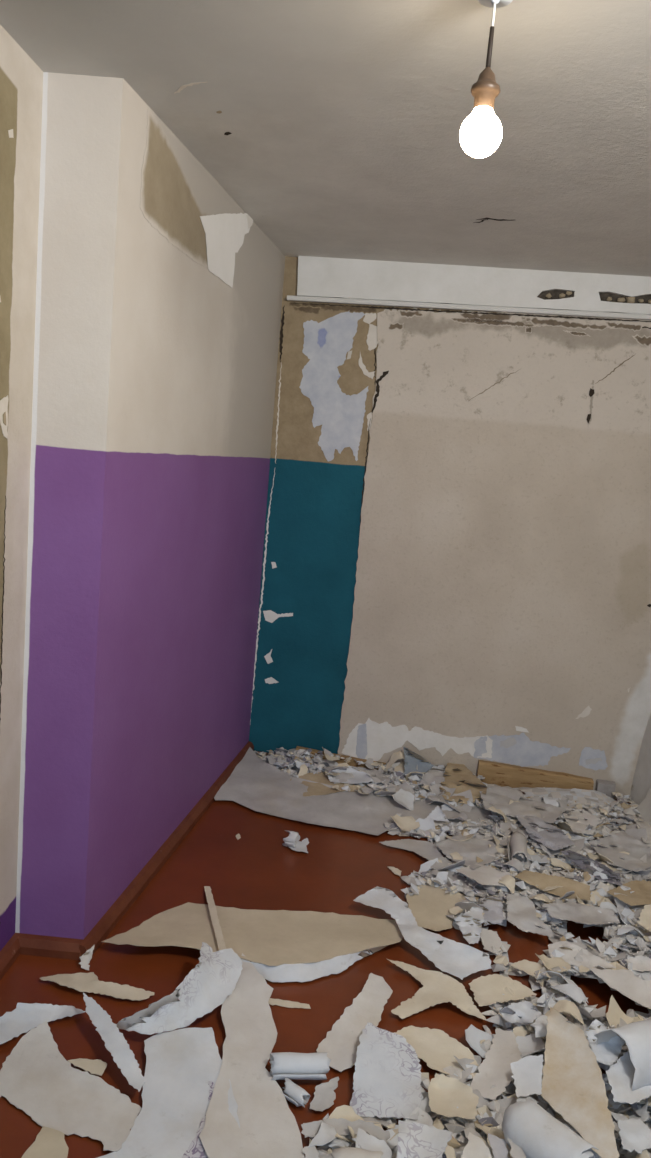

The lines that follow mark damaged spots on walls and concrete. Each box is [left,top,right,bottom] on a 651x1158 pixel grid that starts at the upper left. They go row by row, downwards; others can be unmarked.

flaking render [140,109,213,268]
flaking render [537,290,574,300]
flaking render [599,293,651,304]
peeling [299,310,378,461]
peeling [0,395,9,438]
peeling [263,610,293,623]
peeling [264,649,278,684]
peeling [342,718,608,771]